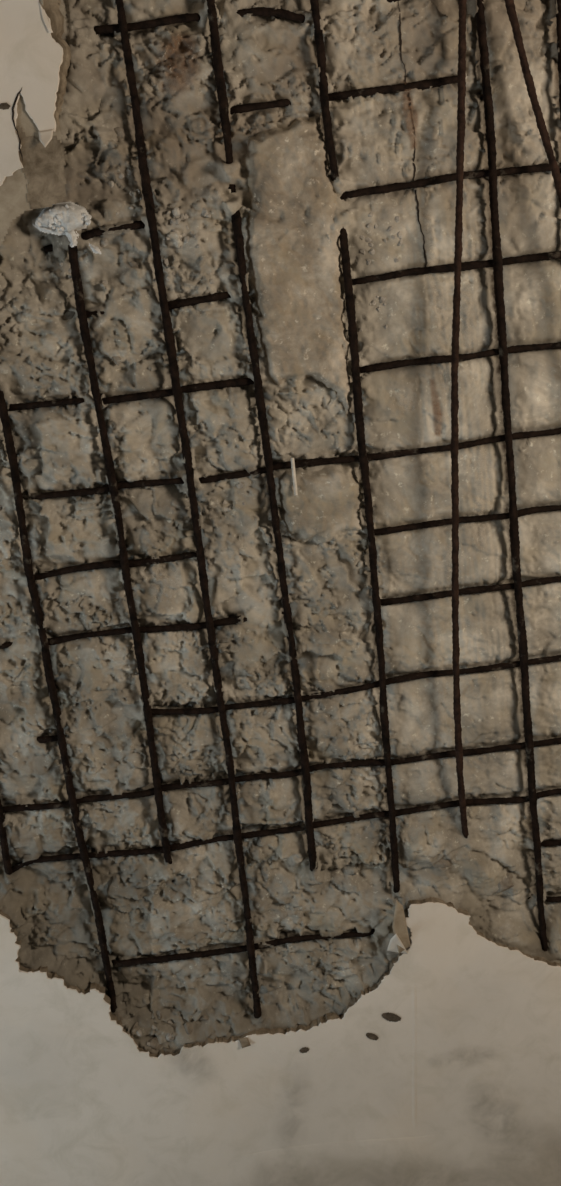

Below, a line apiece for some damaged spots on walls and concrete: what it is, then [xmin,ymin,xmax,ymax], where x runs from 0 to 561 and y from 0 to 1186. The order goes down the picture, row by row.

spalling [0,0,306,1019]
spalling [0,208,561,1057]
corrosion [432,381,442,435]